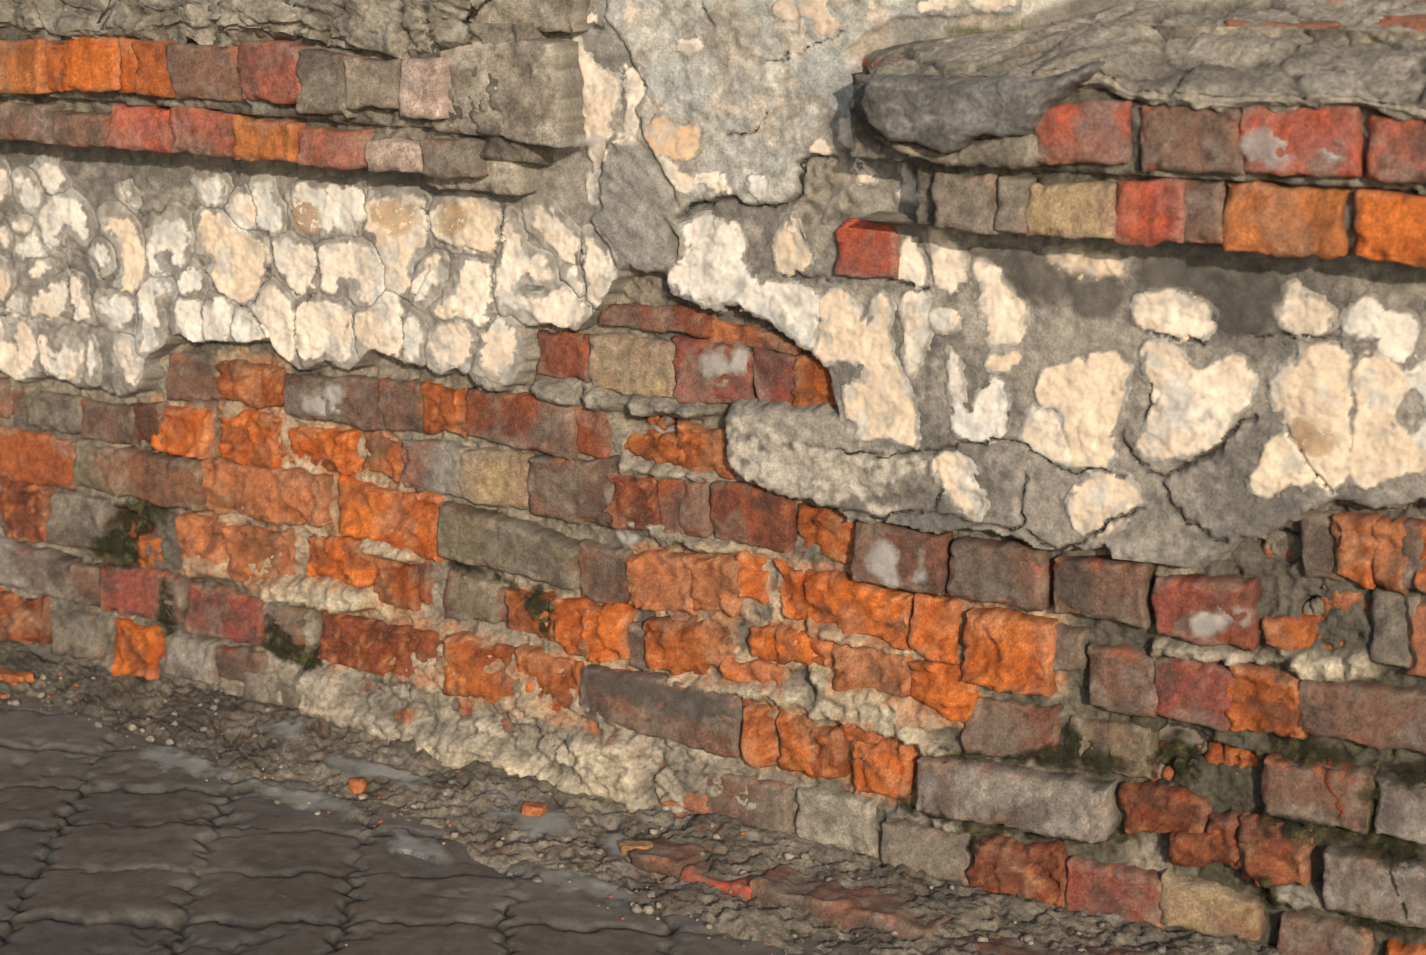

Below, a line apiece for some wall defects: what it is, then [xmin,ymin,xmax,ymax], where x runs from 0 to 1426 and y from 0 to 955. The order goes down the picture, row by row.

peeling [568,0,1426,651]
peeling [0,153,1060,723]
crack [810,390,1257,552]
crack [1333,522,1342,575]
spalling [740,703,919,799]
spalling [1195,663,1309,775]
spalling [1118,740,1317,888]
spalling [965,833,1070,908]
spalling [1385,939,1426,955]